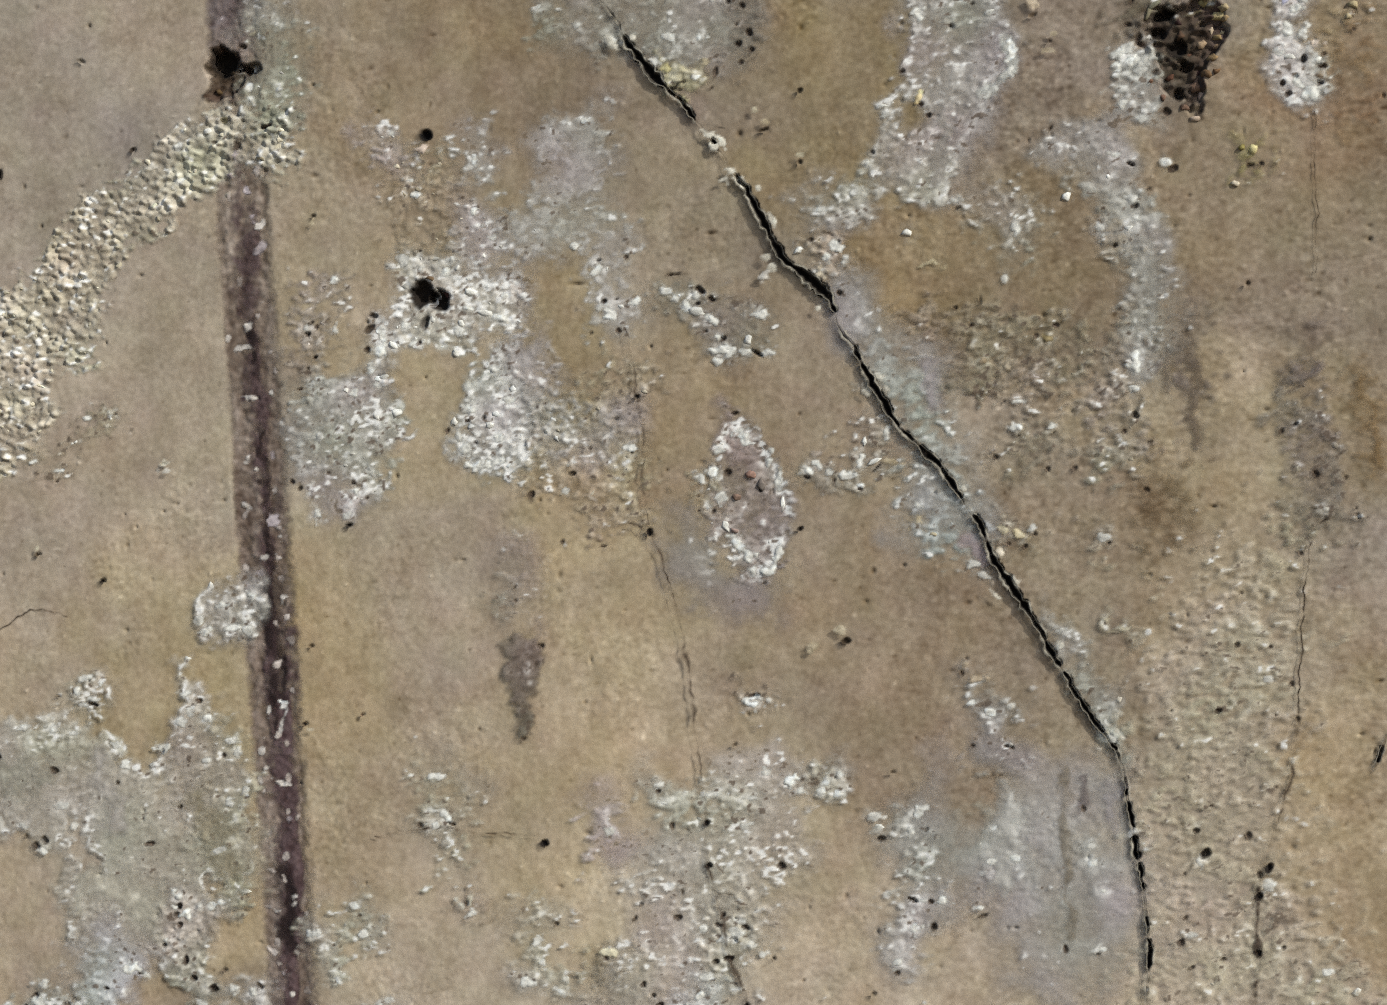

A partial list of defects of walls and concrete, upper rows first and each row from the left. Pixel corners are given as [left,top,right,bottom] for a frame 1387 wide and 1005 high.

spalling [1110,0,1229,123]
spalling [1262,0,1333,117]
peeling [245,129,668,547]
spalling [687,401,903,585]
crack [605,11,1155,1005]
peeling [194,555,290,643]
water stain [495,579,545,741]
crack [1296,585,1305,733]
peeling [0,656,308,1005]
crack [1278,766,1294,820]
spalling [693,895,776,981]
crack [1253,864,1271,997]